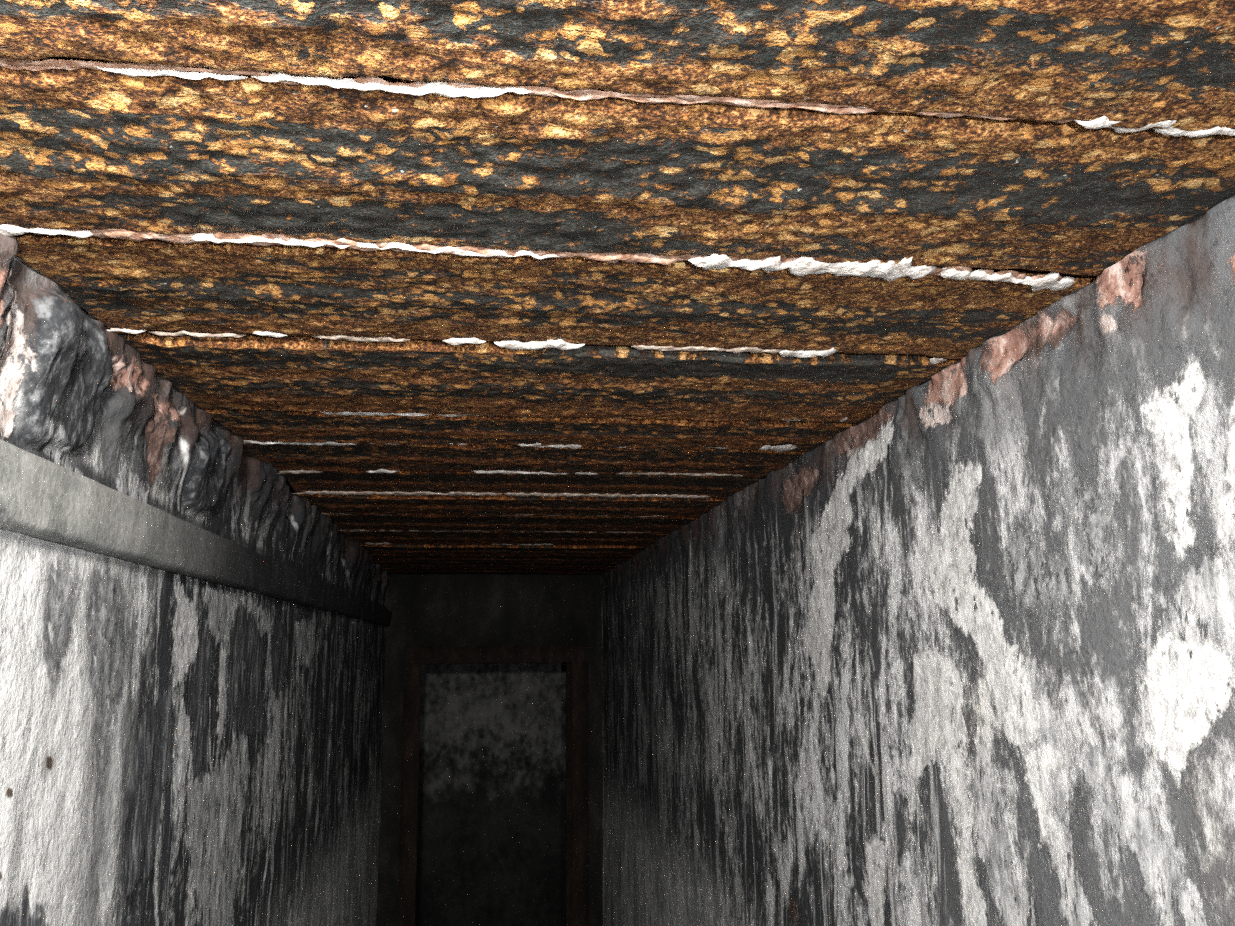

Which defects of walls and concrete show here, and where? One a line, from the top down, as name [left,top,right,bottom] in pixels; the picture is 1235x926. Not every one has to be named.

damp [0,58,1014,120]
damp [1052,116,1235,138]
damp [0,224,1074,292]
damp [107,328,287,338]
damp [313,335,410,343]
damp [443,338,585,350]
damp [631,345,838,358]
damp [43,555,132,792]
damp [122,581,272,926]
damp [856,643,880,802]
damp [953,763,987,926]
damp [865,835,887,926]